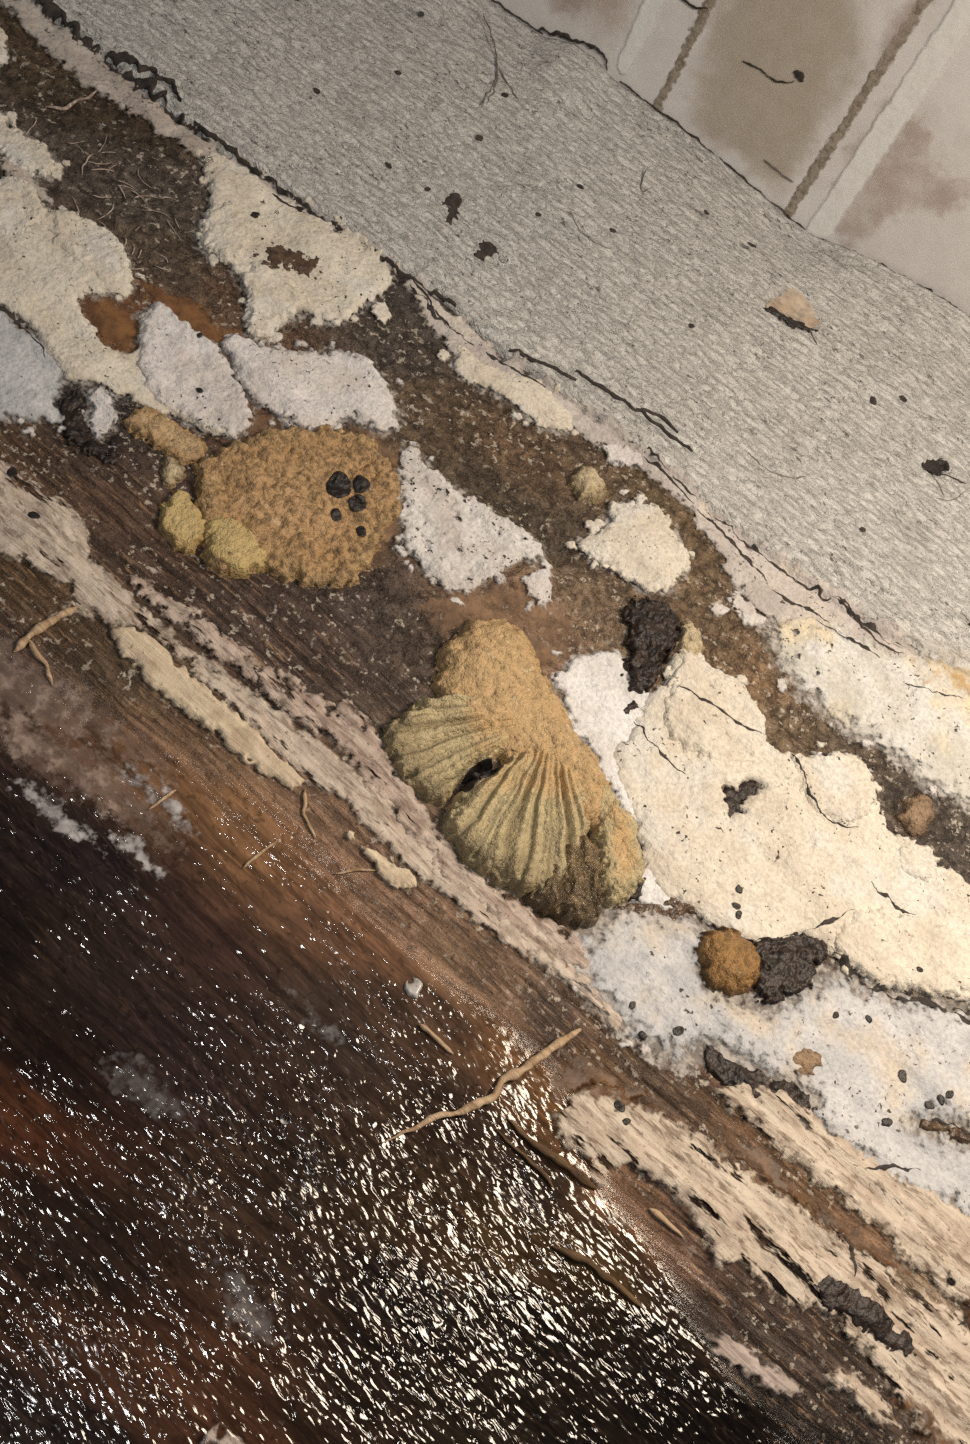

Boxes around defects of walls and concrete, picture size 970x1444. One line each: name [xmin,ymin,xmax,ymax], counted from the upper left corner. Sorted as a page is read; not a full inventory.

spalling [763,288,821,345]
spalling [922,458,969,501]
peeling [110,575,589,969]
peeling [714,1077,970,1301]
peeling [705,1331,799,1397]
peeling [822,1364,903,1439]